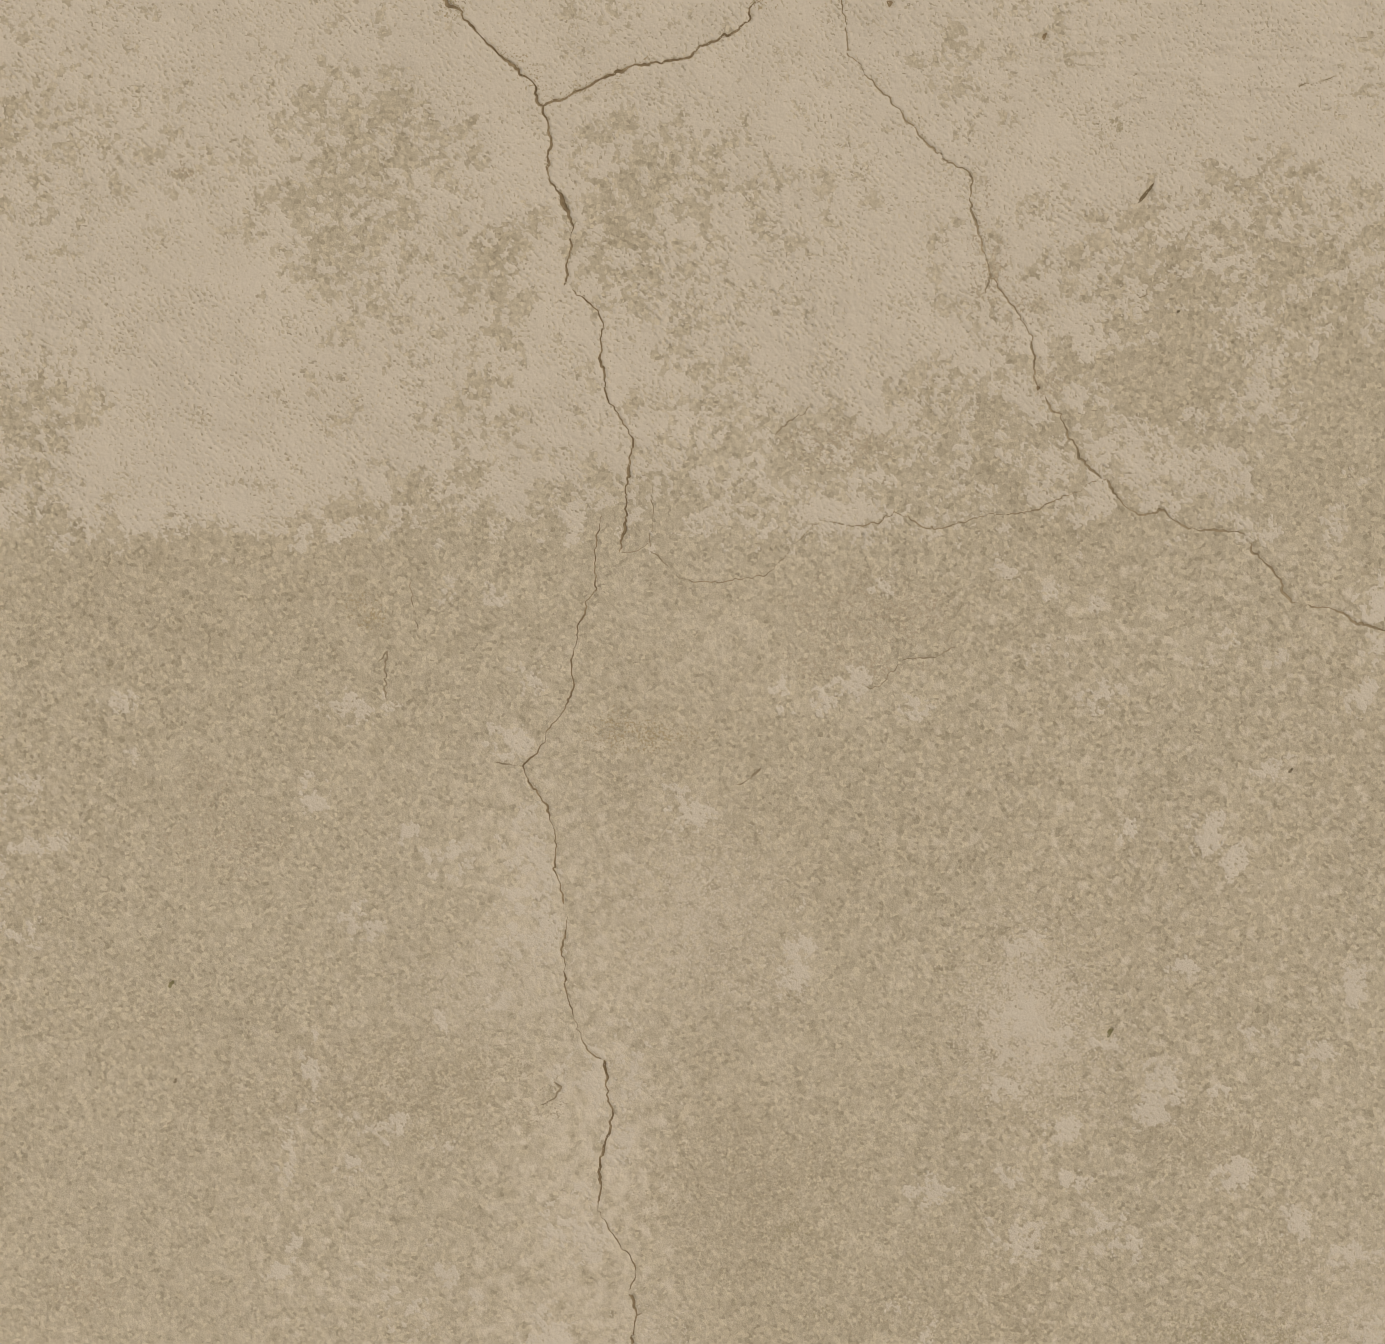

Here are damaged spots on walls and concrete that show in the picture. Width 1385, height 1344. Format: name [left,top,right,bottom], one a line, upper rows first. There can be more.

crack [443,0,1385,1344]